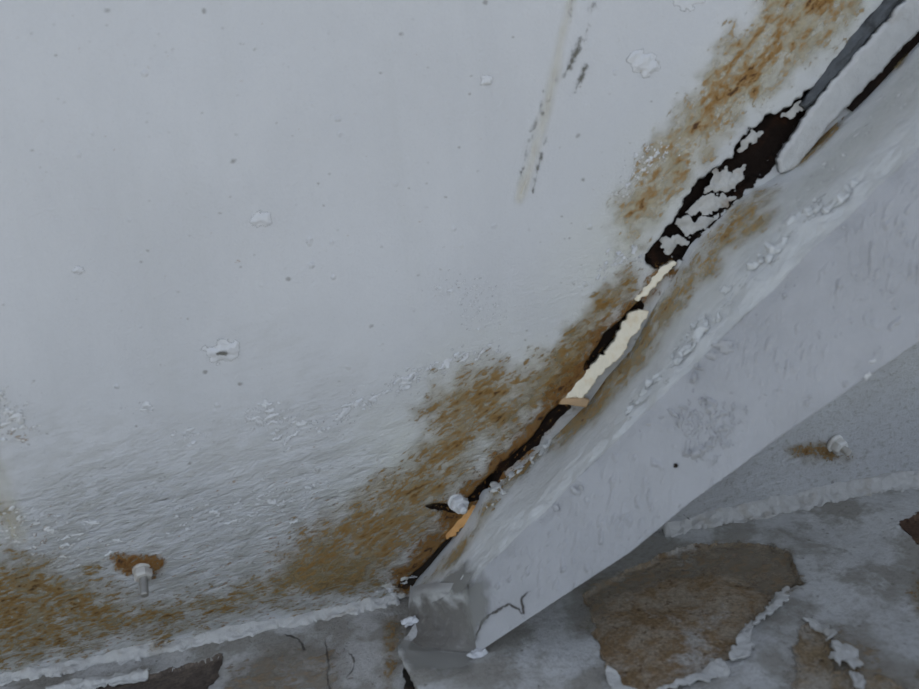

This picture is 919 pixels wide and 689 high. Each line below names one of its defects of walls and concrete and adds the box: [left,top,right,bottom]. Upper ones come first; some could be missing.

crack [846,31,919,112]
corrosion [615,0,864,243]
crack [645,88,813,271]
crack [584,300,644,371]
corrosion [0,189,770,670]
crack [426,404,571,513]
crack [398,537,453,589]
peeling [898,511,919,545]
peeling [45,653,223,689]
crack [475,592,527,640]
peeling [583,542,804,689]
peeling [791,617,905,689]